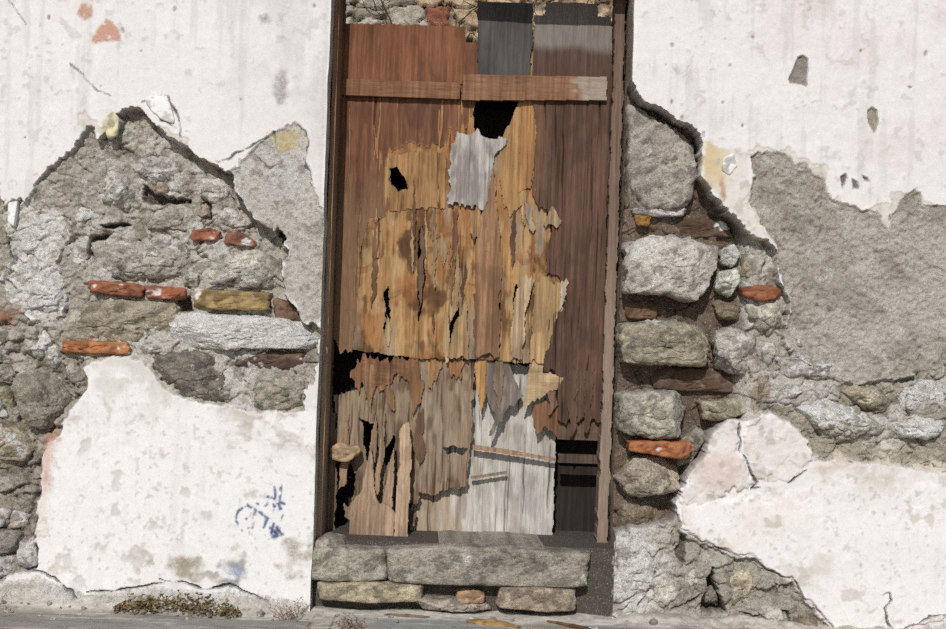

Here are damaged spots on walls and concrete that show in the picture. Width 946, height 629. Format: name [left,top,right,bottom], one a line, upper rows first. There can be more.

spalling [788,54,809,87]
spalling [0,96,324,584]
spalling [611,77,946,627]
crack [22,566,270,604]
crack [881,591,946,629]